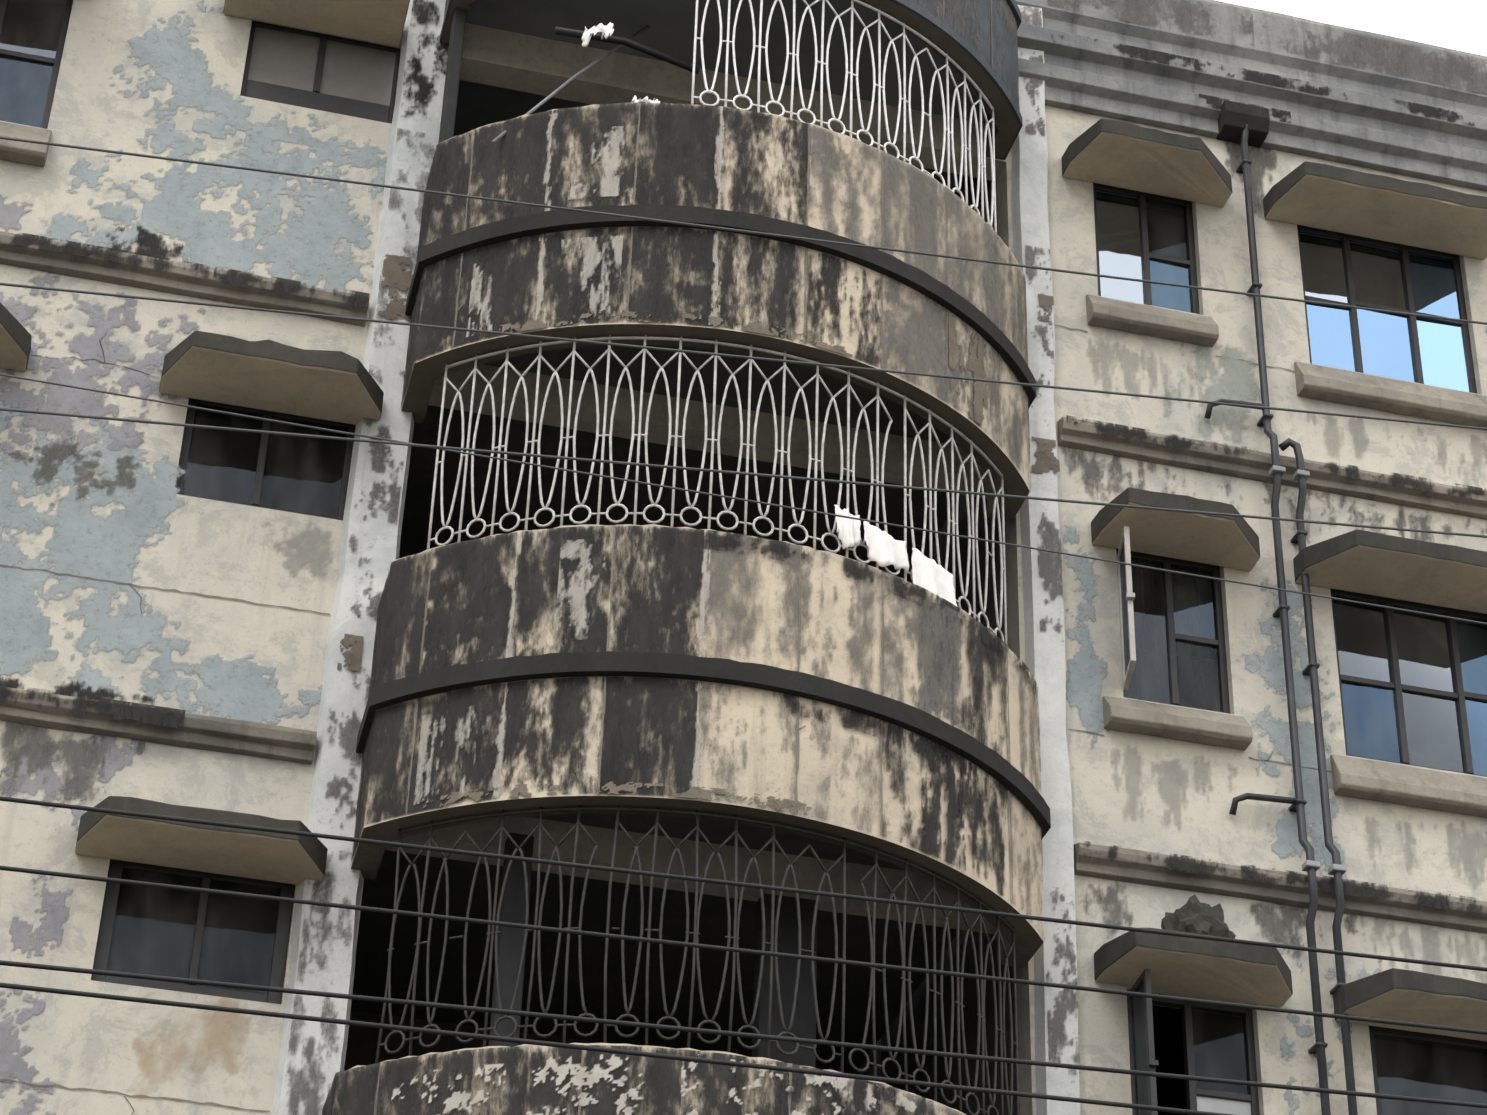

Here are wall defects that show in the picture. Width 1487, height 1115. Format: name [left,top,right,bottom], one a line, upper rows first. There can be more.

peeling [38,0,413,323]
damp [10,226,315,295]
damp [333,0,1054,469]
peeling [0,272,322,725]
crack [0,564,330,615]
damp [298,525,1041,976]
damp [774,692,1132,1075]
crack [0,1079,270,1115]
peeling [391,1064,506,1114]
peeling [526,1054,643,1115]
damp [287,995,967,1115]
peeling [727,1059,923,1115]